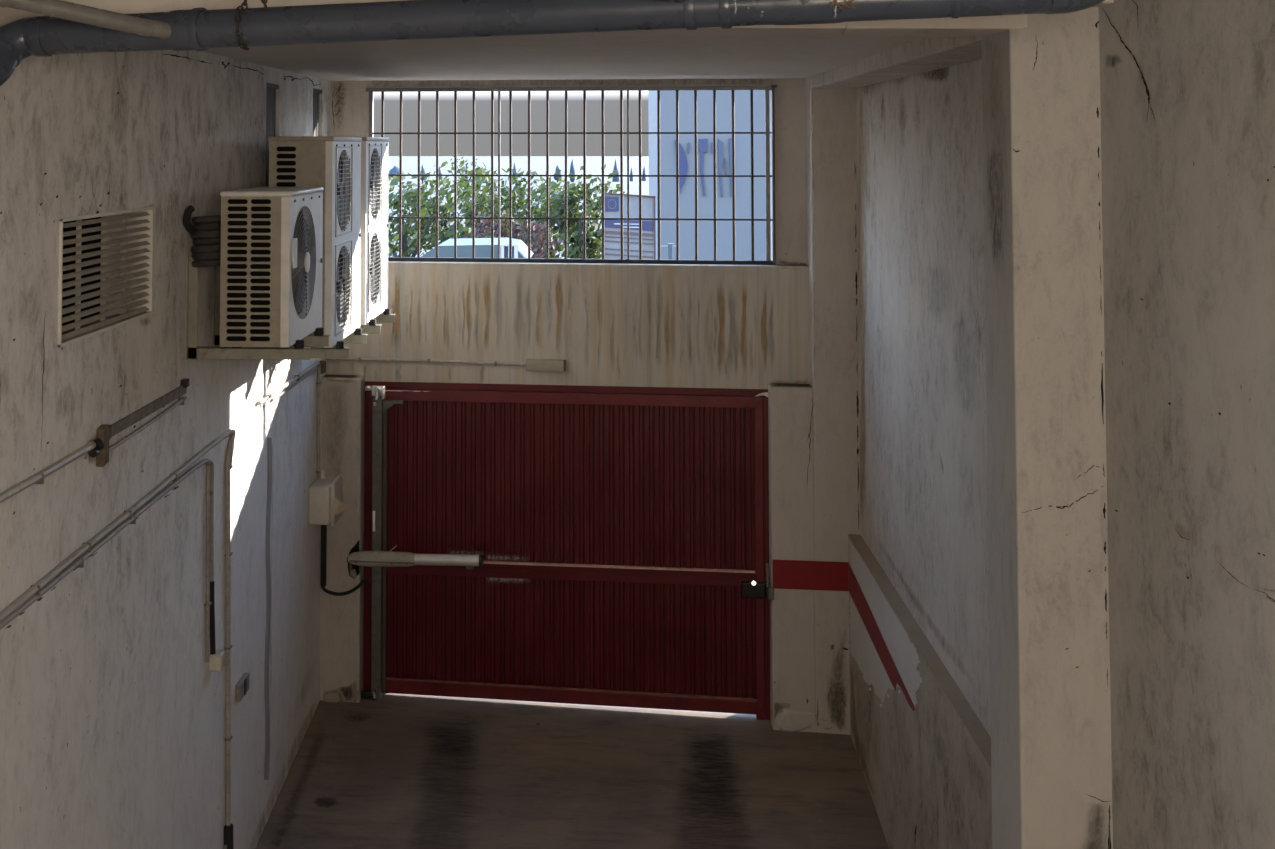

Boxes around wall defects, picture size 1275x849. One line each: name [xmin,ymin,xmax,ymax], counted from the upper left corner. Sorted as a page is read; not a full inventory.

crack [1095,0,1155,119]
crack [1098,352,1106,424]
peeling [849,539,922,708]
crack [1021,464,1107,637]